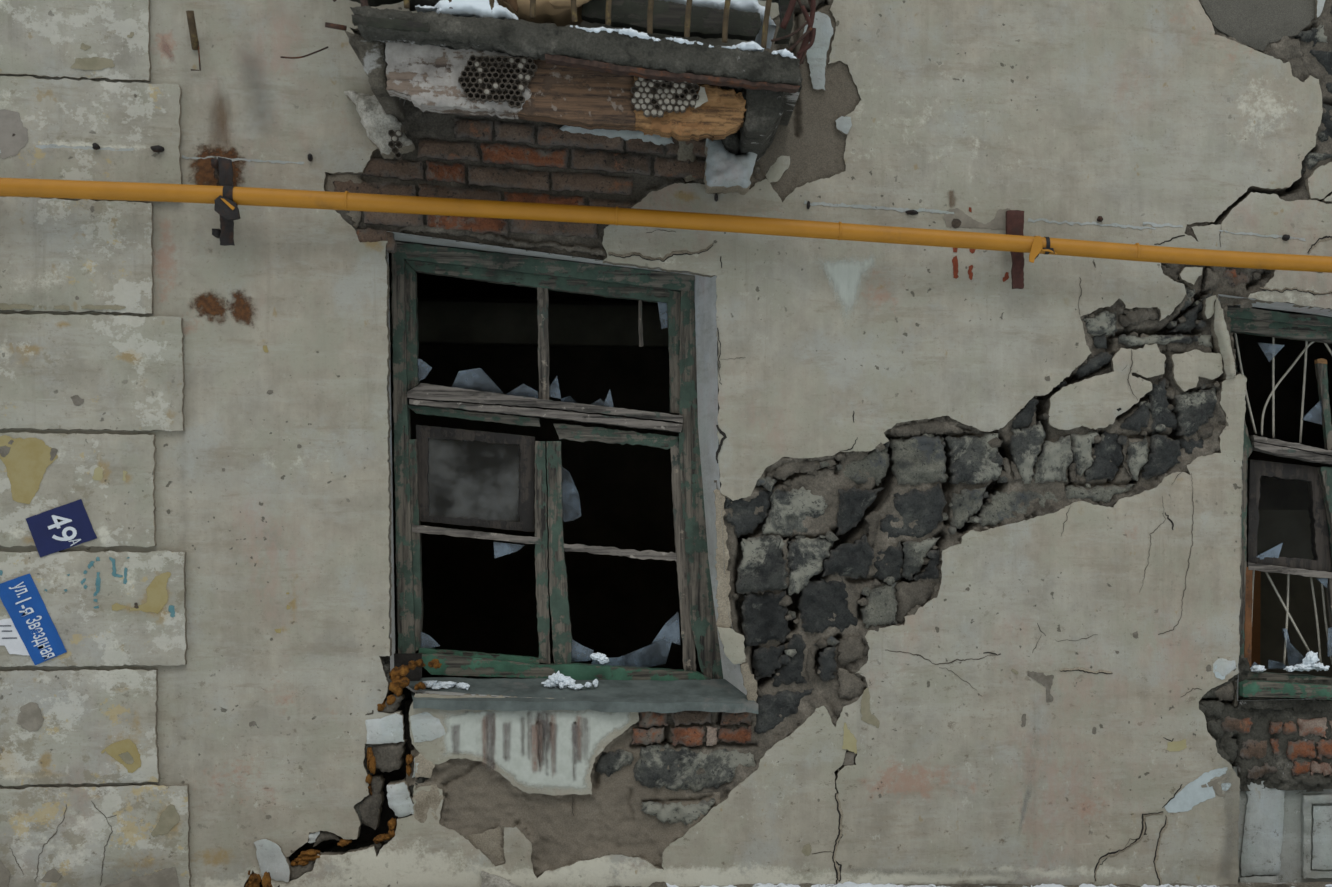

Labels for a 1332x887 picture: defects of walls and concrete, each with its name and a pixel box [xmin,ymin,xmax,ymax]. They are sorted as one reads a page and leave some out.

rust [190,117,245,187]
flaking render [325,100,706,208]
flaking render [749,0,861,203]
flaking render [1185,0,1332,241]
rust [190,290,255,326]
rust [952,248,976,280]
rust [943,192,1010,231]
crack [1260,236,1332,295]
flaking render [406,263,1273,877]
crack [245,653,446,887]
flaking render [1165,658,1332,813]
crack [1094,784,1182,885]